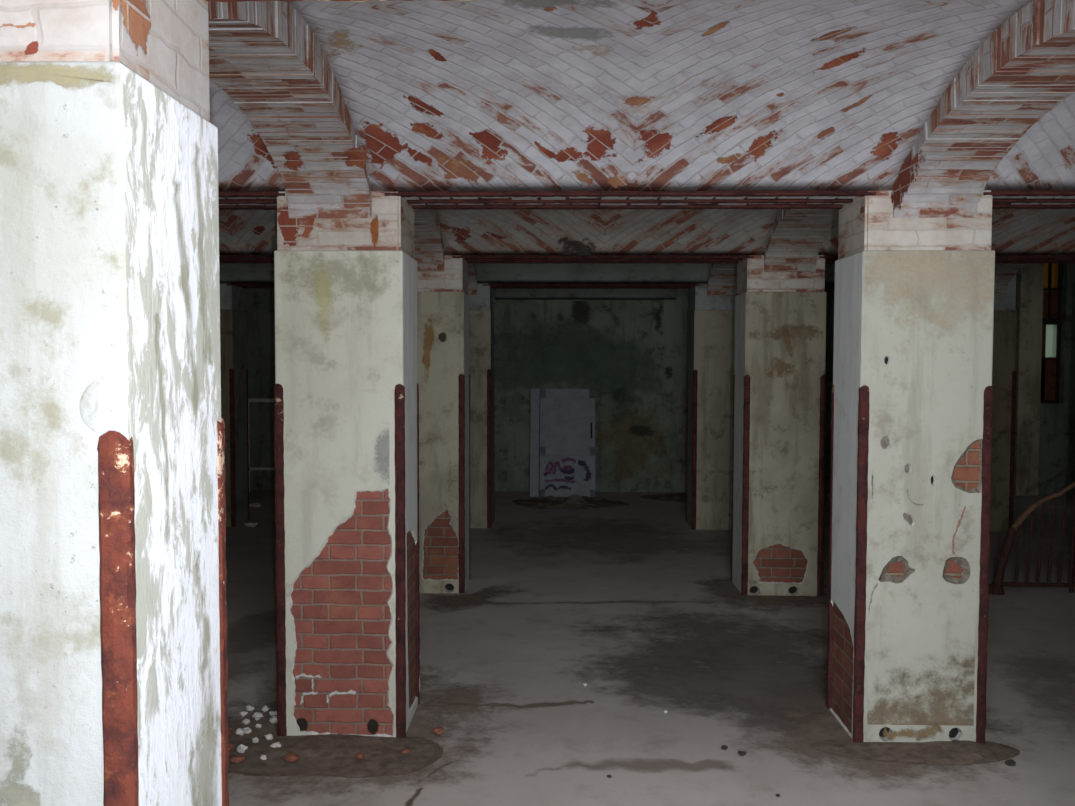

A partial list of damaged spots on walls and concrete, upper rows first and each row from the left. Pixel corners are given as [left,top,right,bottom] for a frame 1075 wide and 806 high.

peeling [403,95,445,141]
peeling [344,121,510,182]
peeling [534,125,617,187]
peeling [637,129,676,167]
peeling [716,130,783,164]
peeling [891,149,926,218]
spalling [951,439,983,493]
spalling [750,543,809,595]
spalling [878,556,915,584]
spalling [942,557,971,584]
spalling [289,488,394,737]
crack [406,762,451,806]